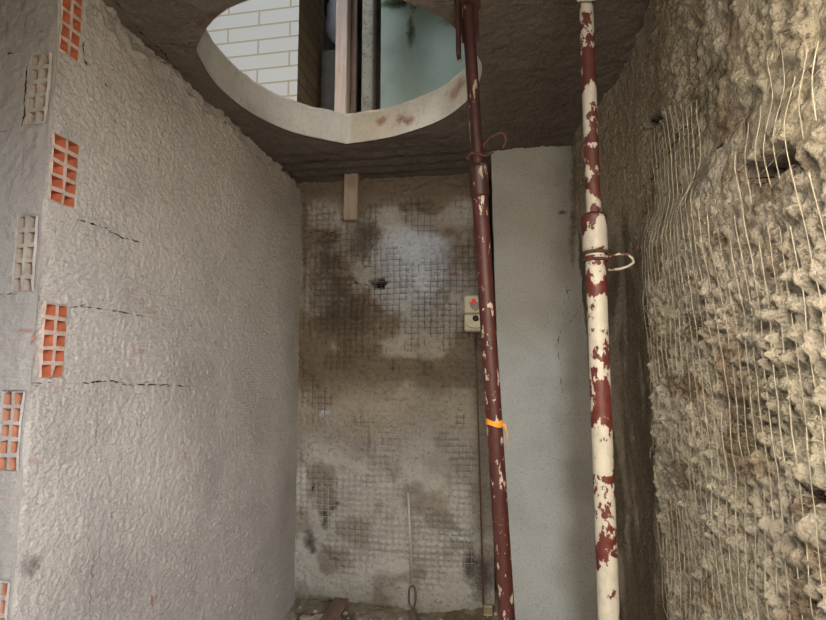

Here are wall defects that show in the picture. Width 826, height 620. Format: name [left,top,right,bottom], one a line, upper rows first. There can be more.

crack [79,220,139,242]
crack [72,379,190,387]
spalling [788,486,826,510]